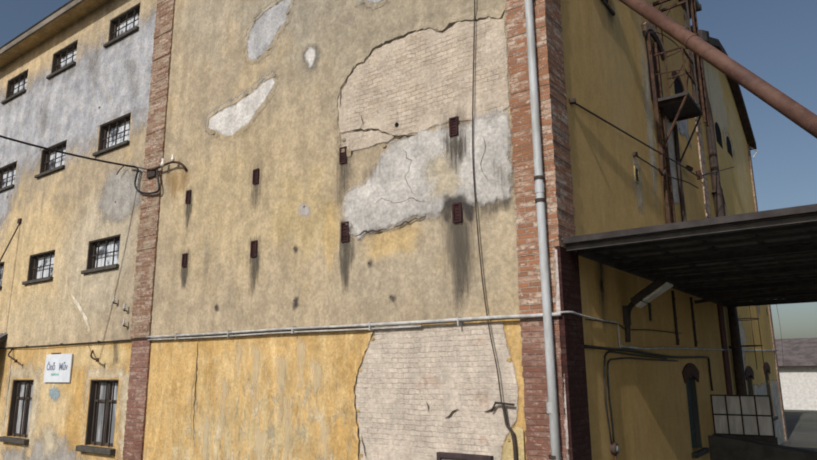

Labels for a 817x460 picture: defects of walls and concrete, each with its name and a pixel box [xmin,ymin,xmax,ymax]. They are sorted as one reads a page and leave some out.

peeling [205,72,279,142]
peeling [243,0,294,65]
peeling [304,45,318,70]
flaking render [331,6,509,158]
crack [357,147,427,236]
leakage [340,220,353,284]
flaking render [738,317,746,372]
crack [190,343,198,437]
flaking render [348,321,518,460]
flaking render [753,380,785,445]